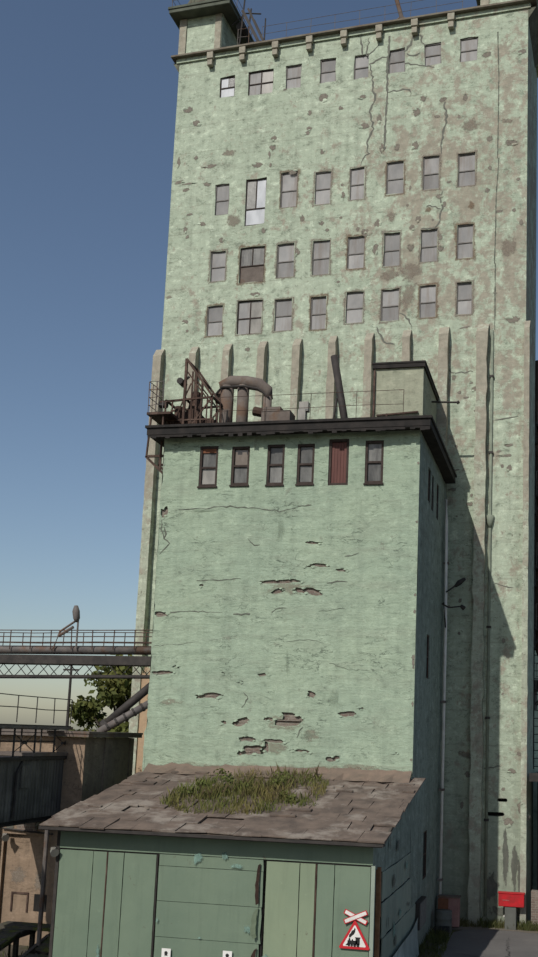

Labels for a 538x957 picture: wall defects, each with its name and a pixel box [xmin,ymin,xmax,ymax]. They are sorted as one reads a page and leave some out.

crack [360,34,432,166]
crack [440,102,448,154]
crack [421,191,444,229]
spalling [303,563,349,572]
spalling [259,578,322,596]
spalling [338,706,363,717]
spalling [219,712,318,755]
peeling [326,756,375,769]